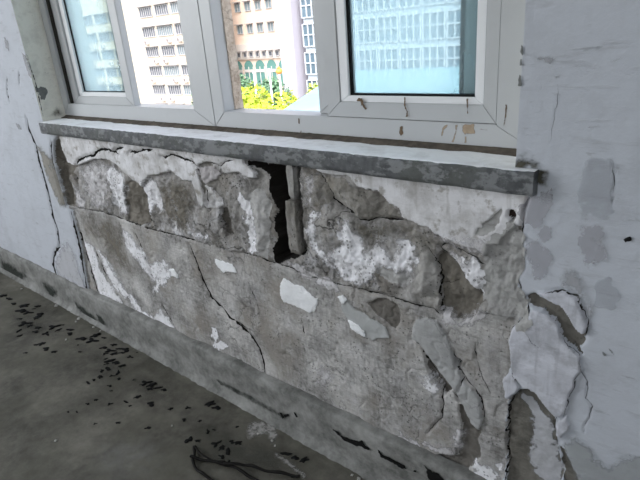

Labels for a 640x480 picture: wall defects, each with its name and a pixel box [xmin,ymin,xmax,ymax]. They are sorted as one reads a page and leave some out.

corrosion [452,124,475,143]
crack [319,171,403,221]
water stain [515,160,547,184]
crack [27,120,265,369]
flaking render [55,136,589,480]
crack [332,243,484,313]